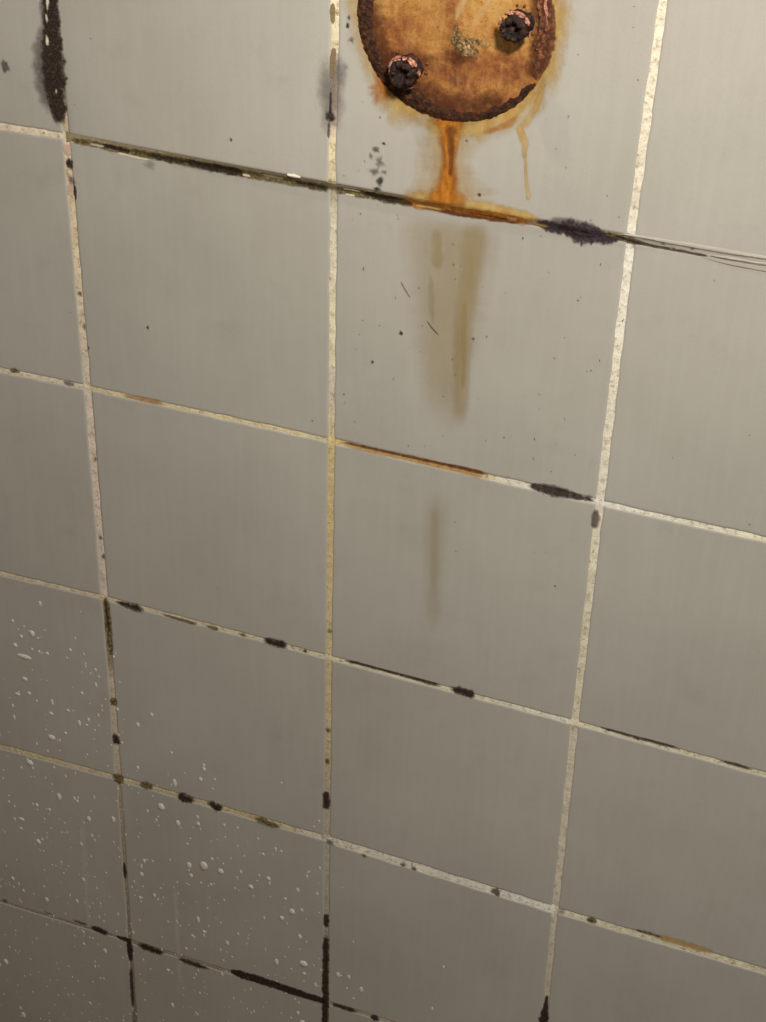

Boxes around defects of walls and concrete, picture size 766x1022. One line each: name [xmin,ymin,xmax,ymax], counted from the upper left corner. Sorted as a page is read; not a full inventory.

damp [36,0,67,122]
corrosion [354,0,561,227]
damp [73,138,413,206]
damp [538,218,655,247]
corrosion [348,442,484,474]
damp [531,483,599,527]
damp [347,660,438,686]
damp [452,686,475,698]
damp [602,727,674,748]
damp [75,920,163,1006]
damp [231,914,354,1022]